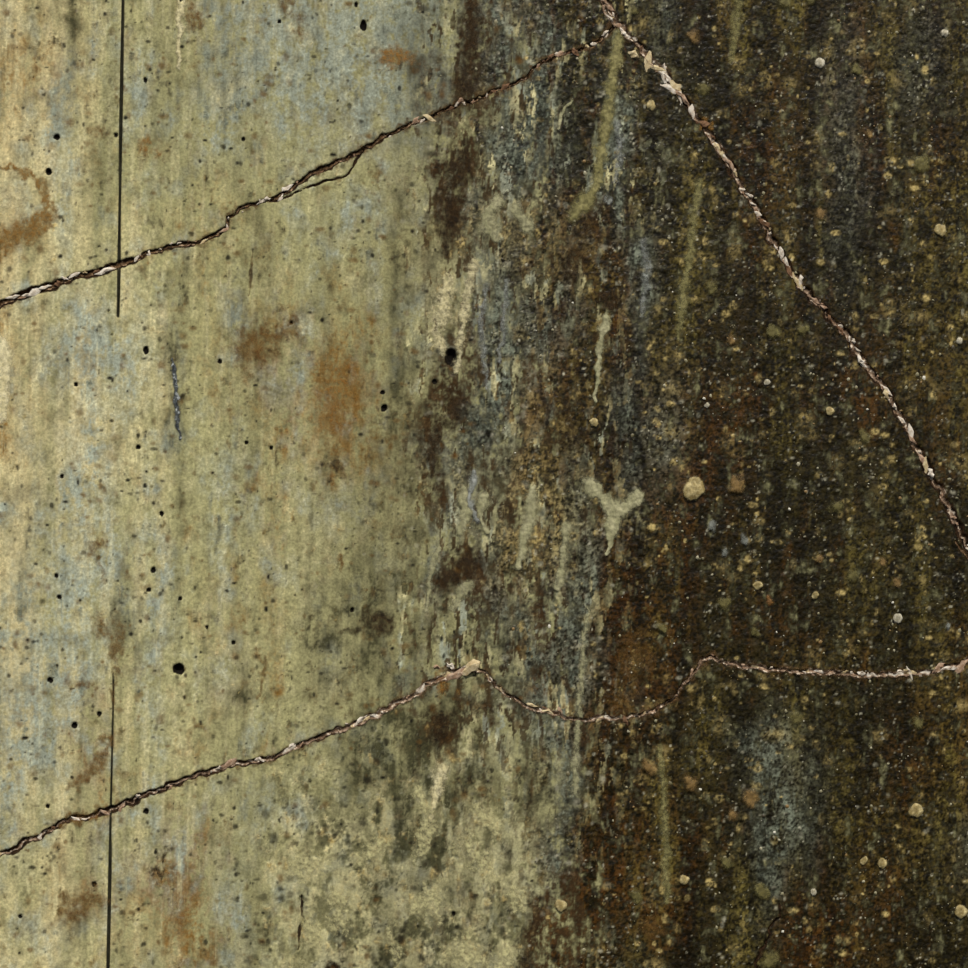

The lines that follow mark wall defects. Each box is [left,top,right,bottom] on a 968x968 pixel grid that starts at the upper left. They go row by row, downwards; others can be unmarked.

leakage [450,2,485,101]
leakage [729,0,742,60]
leakage [427,149,473,256]
crack [0,0,968,559]
leakage [570,31,623,242]
leakage [592,288,622,403]
leakage [676,179,702,339]
leakage [425,539,487,612]
leakage [570,608,590,794]
leakage [428,763,449,822]
crack [0,651,968,968]
leakage [658,746,672,904]